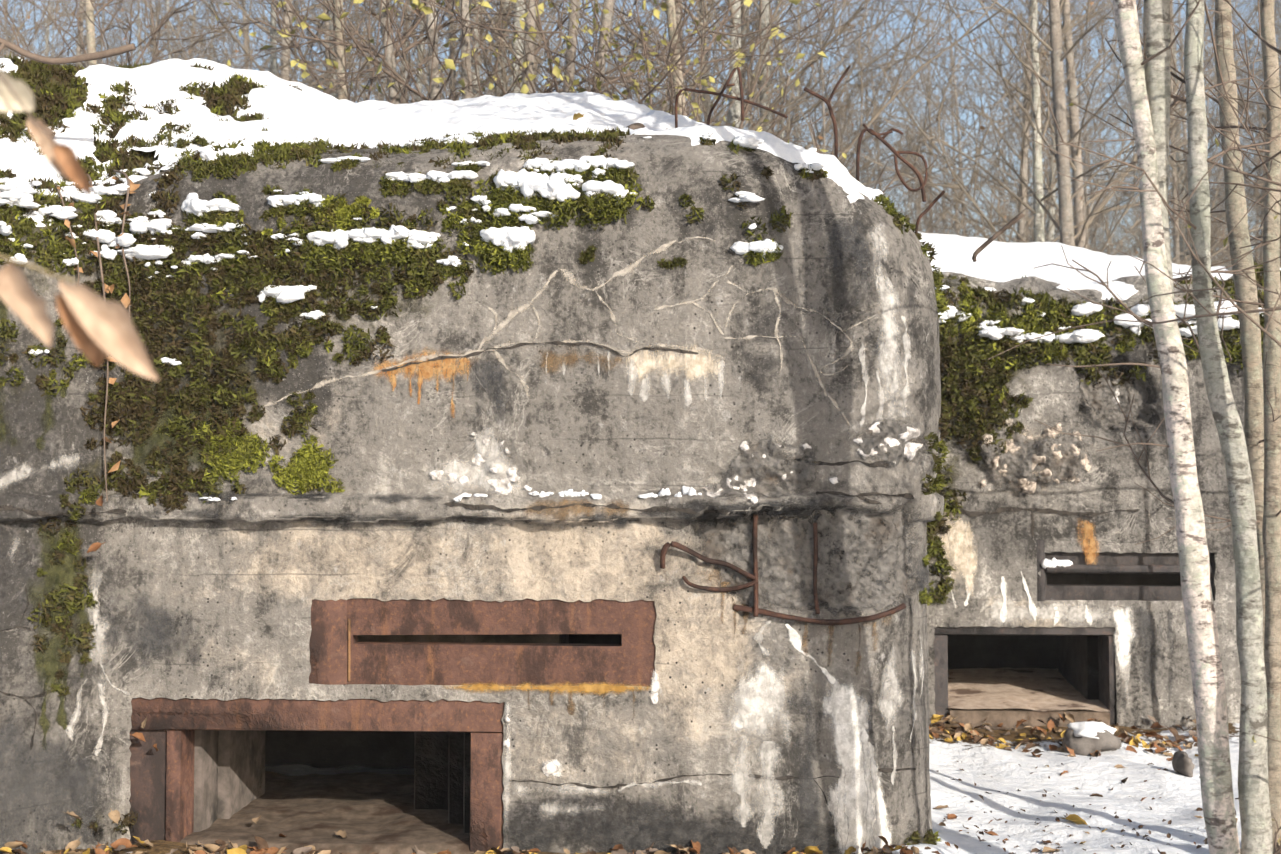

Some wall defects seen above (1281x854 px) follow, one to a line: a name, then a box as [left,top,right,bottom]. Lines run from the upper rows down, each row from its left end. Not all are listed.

corrosion [374,351,470,416]
crack [264,236,914,504]
efflorescence [628,348,723,407]
crack [445,502,733,515]
crack [947,507,1140,539]
corrosion [1078,521,1098,565]
corrosion [709,566,749,634]
damp [512,621,924,854]
crack [508,768,916,817]